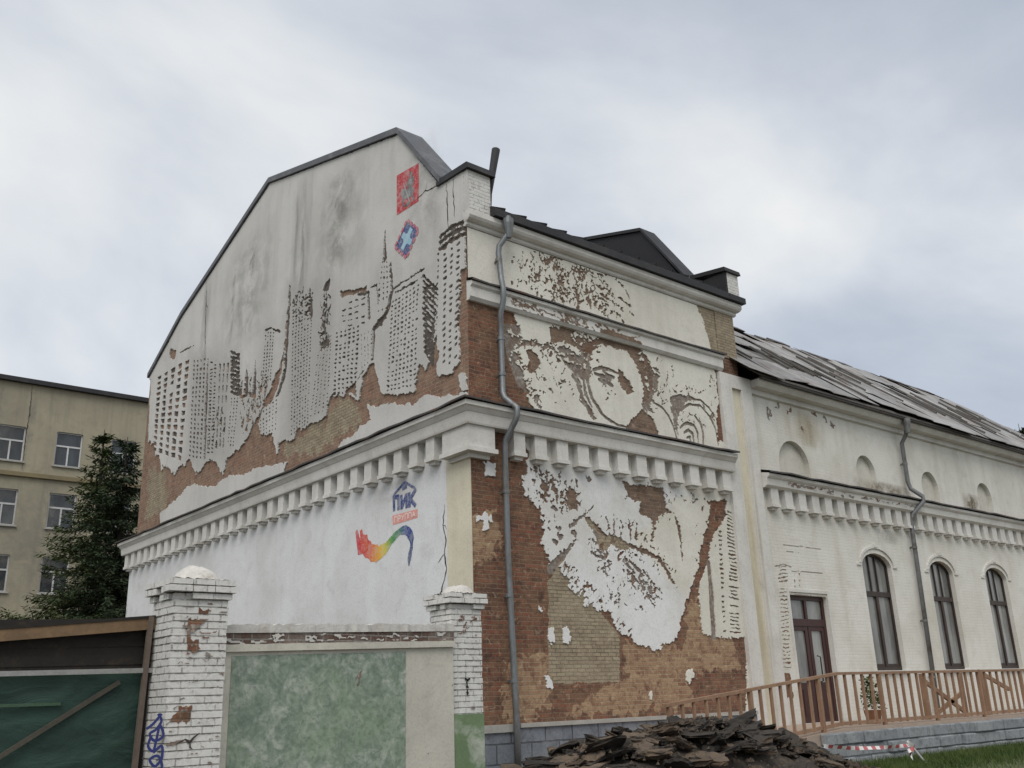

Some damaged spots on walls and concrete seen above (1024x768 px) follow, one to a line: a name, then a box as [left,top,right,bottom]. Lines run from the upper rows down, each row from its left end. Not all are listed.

crack [408,182,455,231]
flaking render [137,236,723,534]
crack [439,505,447,593]
flaking render [437,432,747,726]
peeling [178,603,266,700]
peeling [305,633,418,642]
peeling [166,697,200,736]